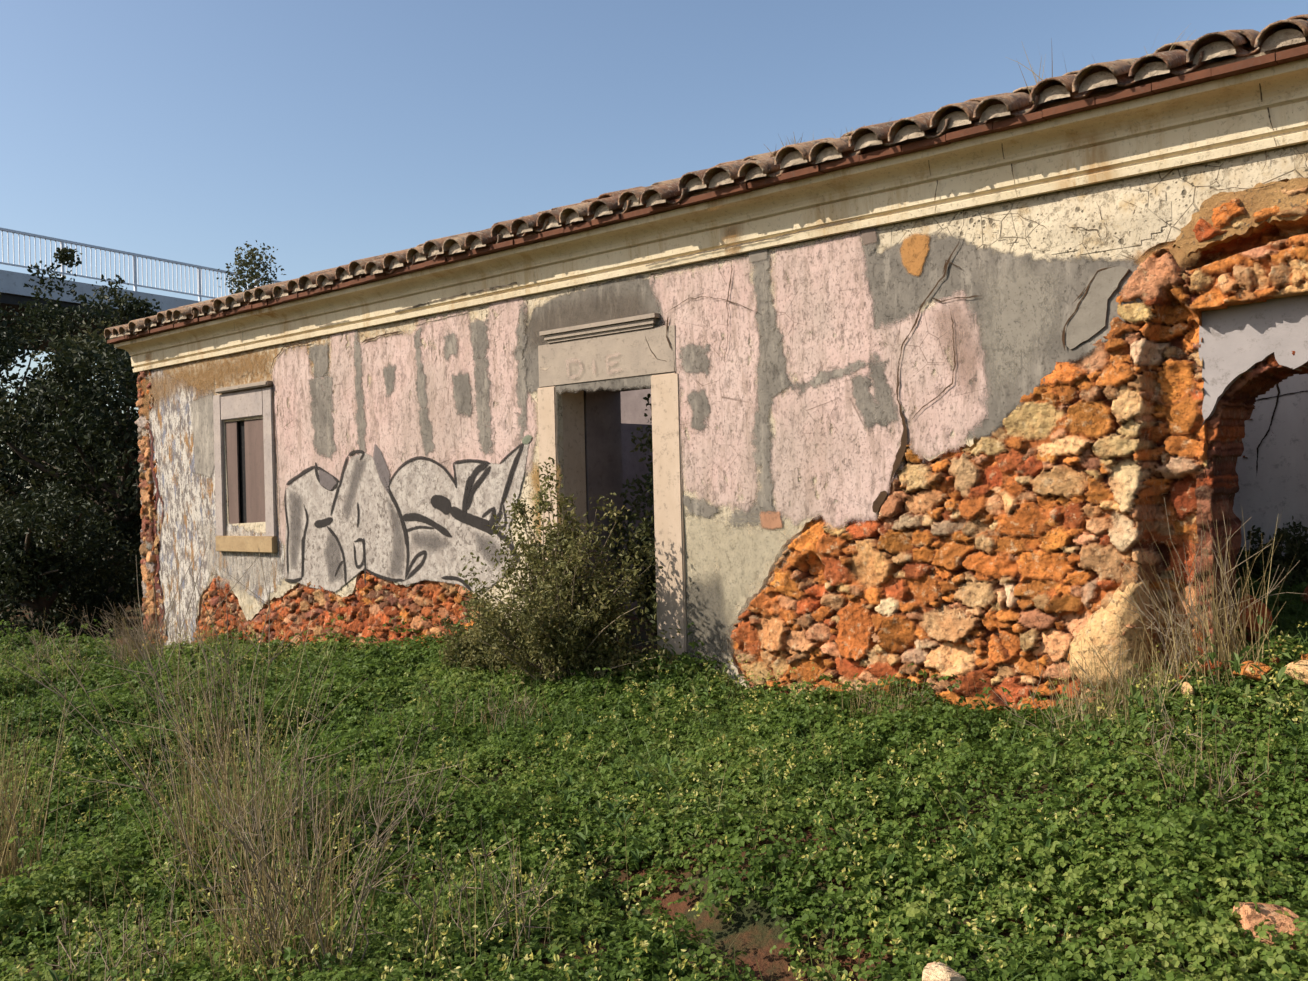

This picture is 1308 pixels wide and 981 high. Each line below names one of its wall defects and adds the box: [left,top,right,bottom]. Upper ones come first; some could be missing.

crack [1210,83,1308,192]
flaking render [900,233,929,276]
crack [872,144,1137,513]
peeling [134,368,480,652]
flaking render [760,511,782,529]